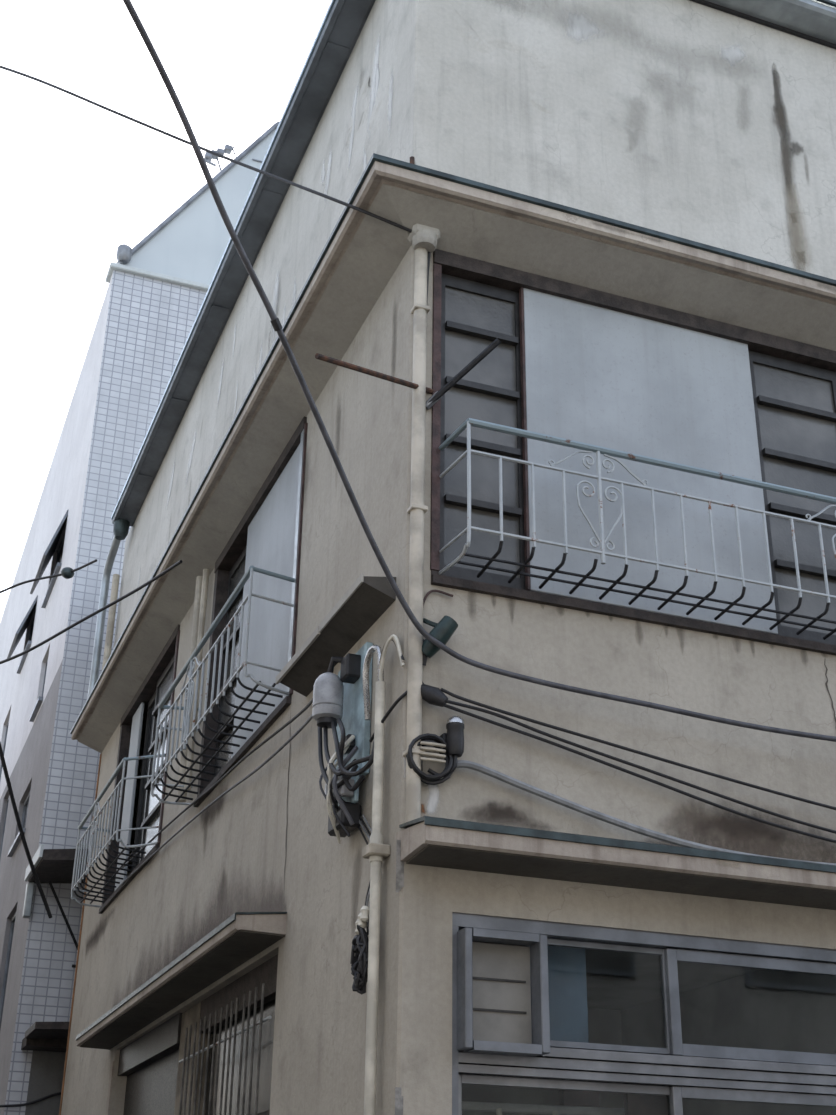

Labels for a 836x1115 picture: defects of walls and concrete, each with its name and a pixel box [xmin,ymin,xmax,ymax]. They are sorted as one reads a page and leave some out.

damp [773,69,802,188]
crack [824,664,836,722]
damp [201,794,223,823]
damp [475,804,536,827]
damp [680,811,836,864]
damp [86,923,105,948]